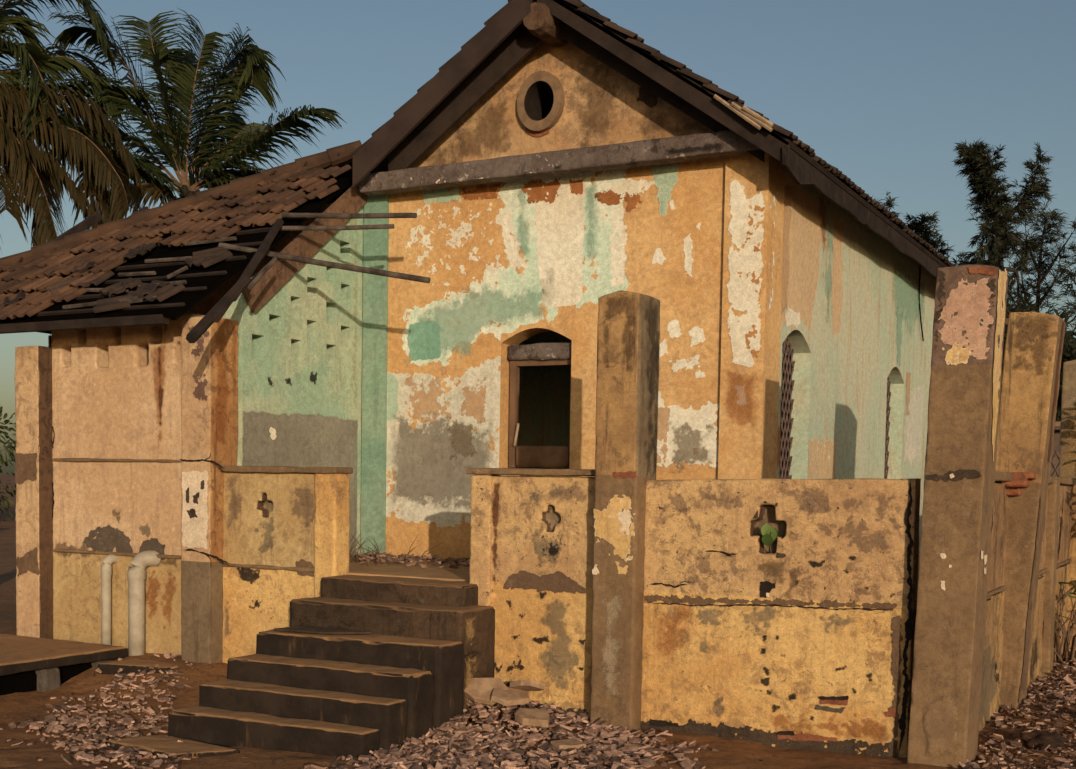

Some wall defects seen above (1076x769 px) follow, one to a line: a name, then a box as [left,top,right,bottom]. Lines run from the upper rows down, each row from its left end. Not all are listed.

peeling [726,169,845,367]
peeling [386,168,655,528]
peeling [659,319,706,378]
peeling [934,266,1007,461]
peeling [657,387,720,468]
peeling [181,470,209,549]
peeling [593,494,635,575]
crack [1038,495,1070,579]
flaking render [503,570,586,594]
crack [898,469,982,755]